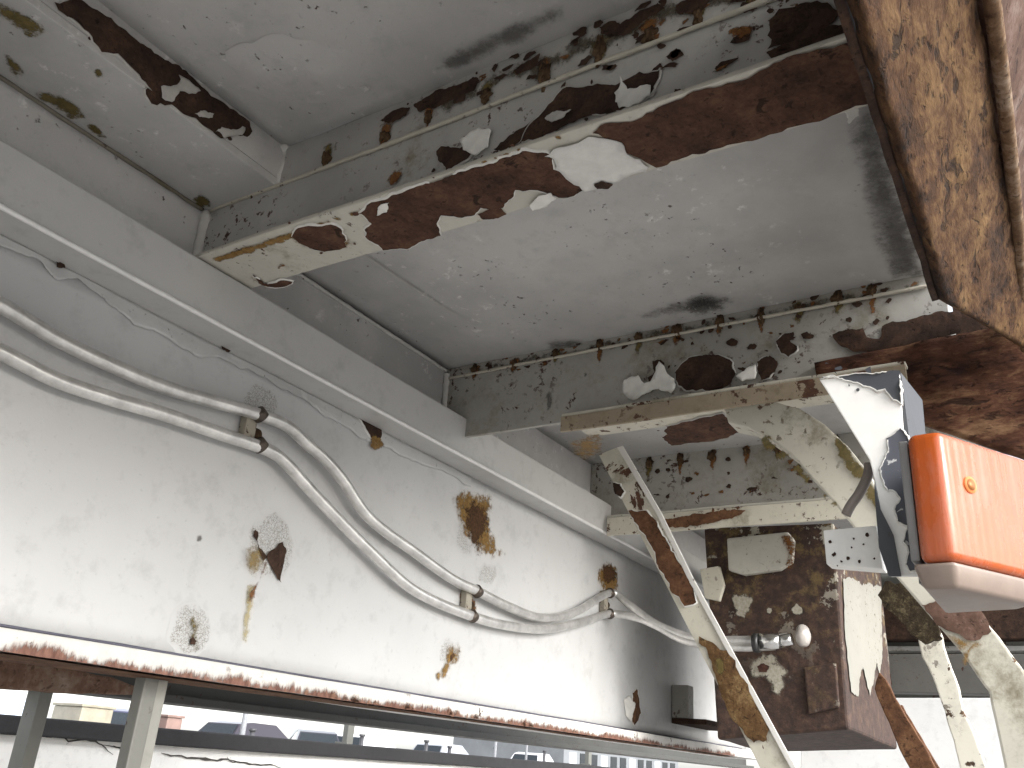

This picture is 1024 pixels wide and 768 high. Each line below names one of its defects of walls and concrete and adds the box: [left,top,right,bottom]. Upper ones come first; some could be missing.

peeling [55,0,253,141]
damp [445,14,555,67]
peeling [288,0,867,254]
damp [853,121,922,276]
peeling [611,295,819,400]
peeling [819,363,904,406]
peeling [833,282,962,352]
spalling [244,530,287,637]
rust [453,492,501,586]
rust [598,564,619,590]
rust [0,636,737,758]
spalling [624,689,641,726]